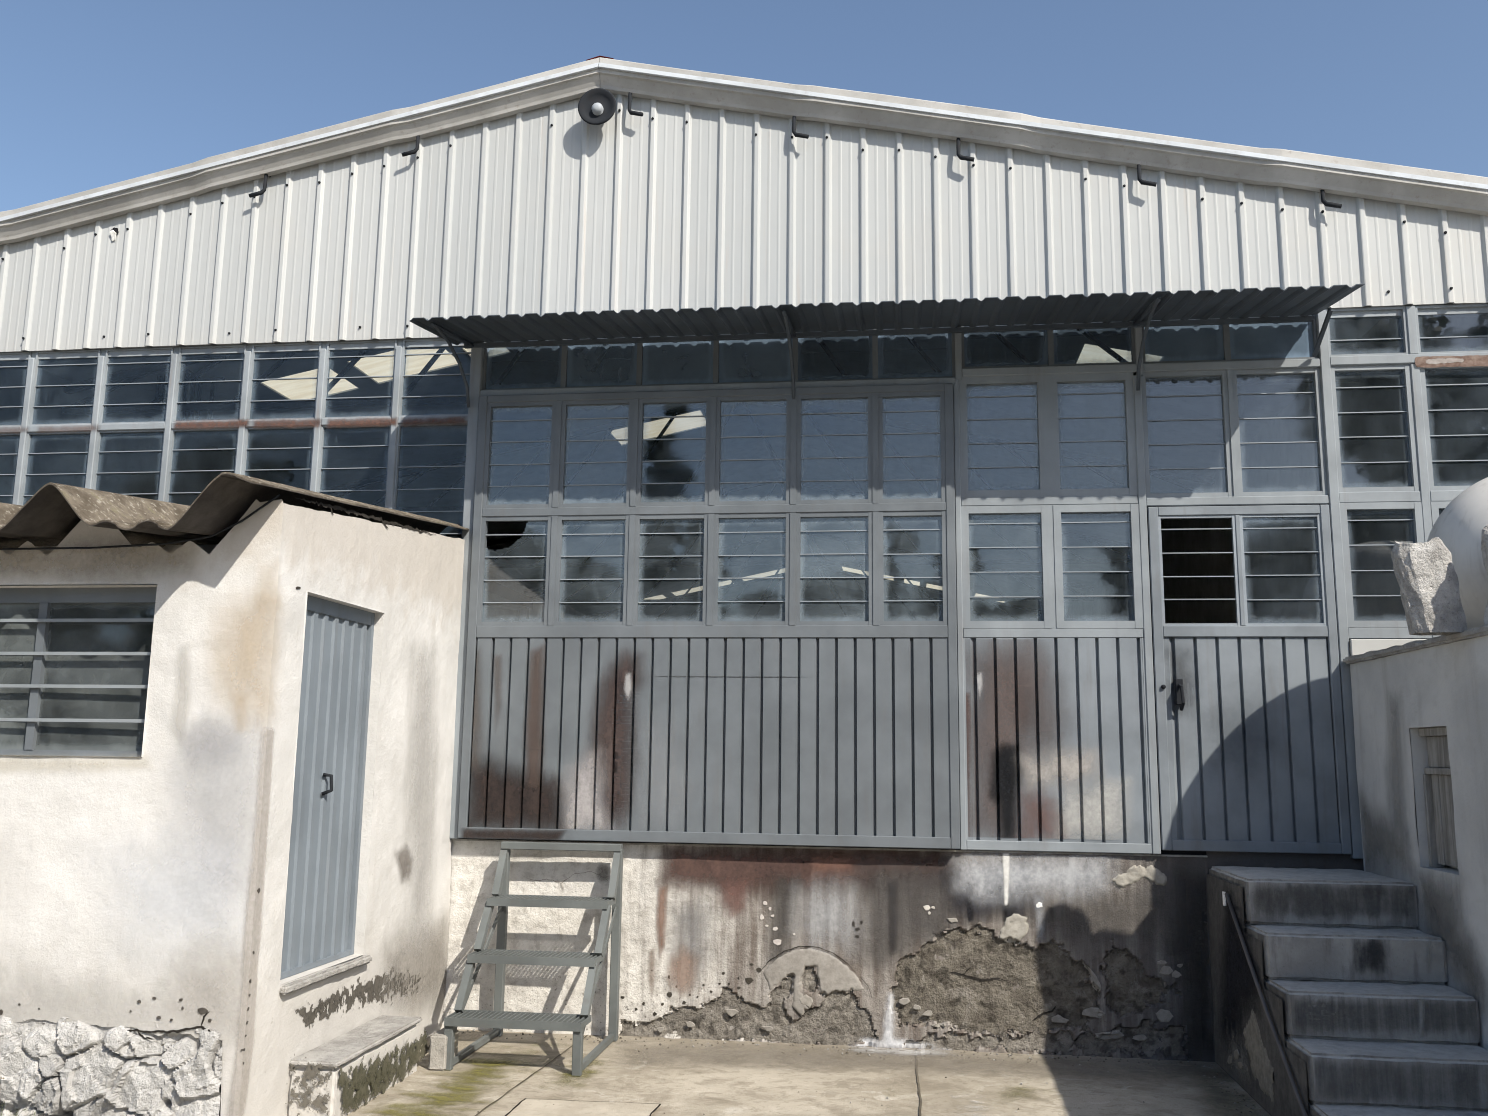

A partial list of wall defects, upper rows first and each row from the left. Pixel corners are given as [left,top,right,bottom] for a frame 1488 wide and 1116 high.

rust [651,846,957,984]
crack [102,1011,222,1042]
peeling [296,966,425,1028]
spalling [620,963,877,1047]
spalling [891,905,1190,1059]